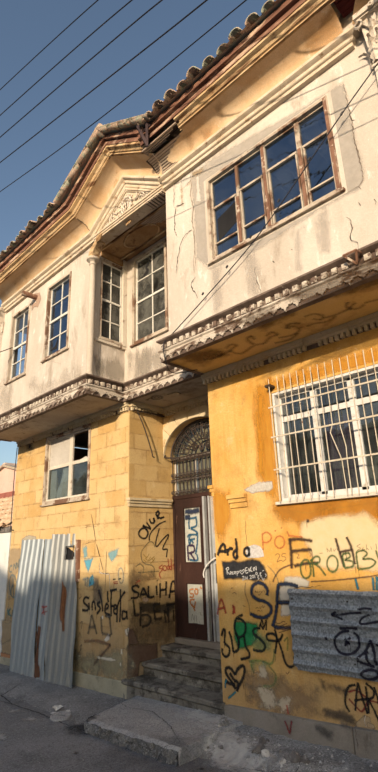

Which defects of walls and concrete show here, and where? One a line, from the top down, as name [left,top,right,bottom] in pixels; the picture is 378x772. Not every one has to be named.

crack [343,84,378,249]
crack [173,175,198,298]
spalling [301,513,378,571]